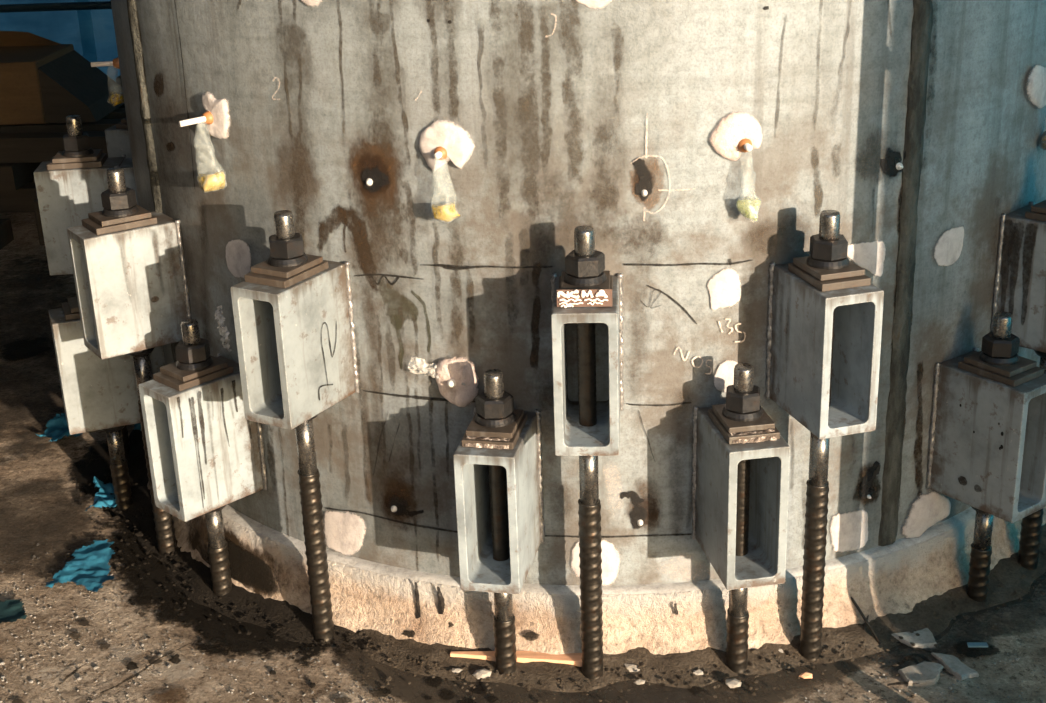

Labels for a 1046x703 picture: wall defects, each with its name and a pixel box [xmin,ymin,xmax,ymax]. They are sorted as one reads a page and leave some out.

water stain [428,0,454,42]
water stain [432,44,459,117]
water stain [482,0,583,213]
rust [350,143,400,209]
water stain [593,163,617,210]
rust [319,206,377,291]
rust [367,472,414,529]
rust [630,483,659,529]